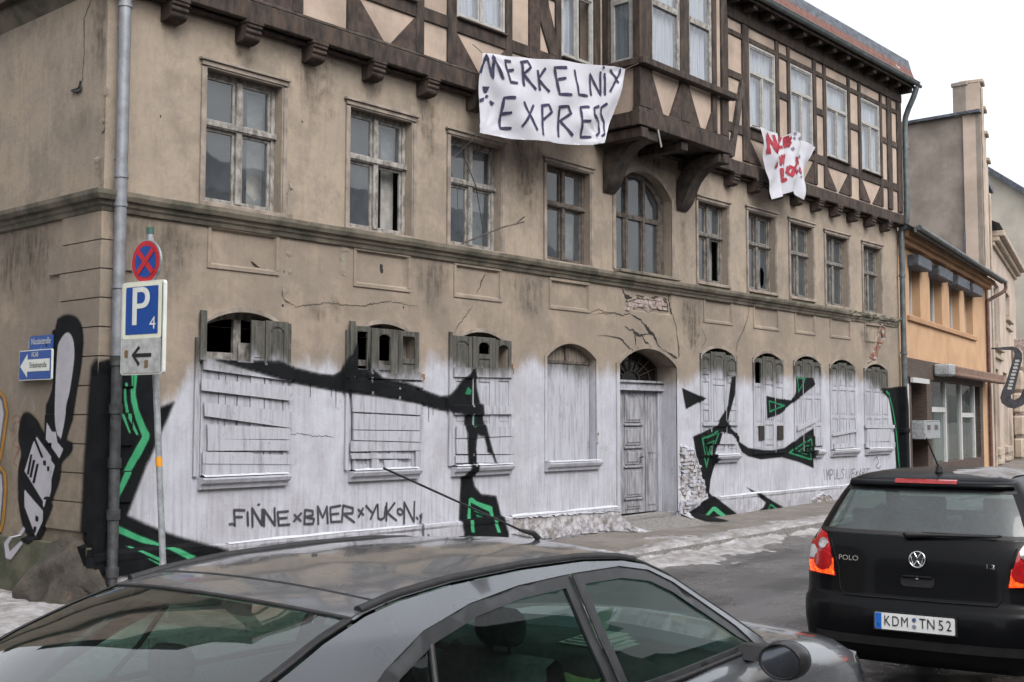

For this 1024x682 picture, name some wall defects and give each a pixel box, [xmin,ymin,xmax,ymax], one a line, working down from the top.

spalling [624,295,669,313]
crack [592,288,706,359]
spalling [678,444,709,519]